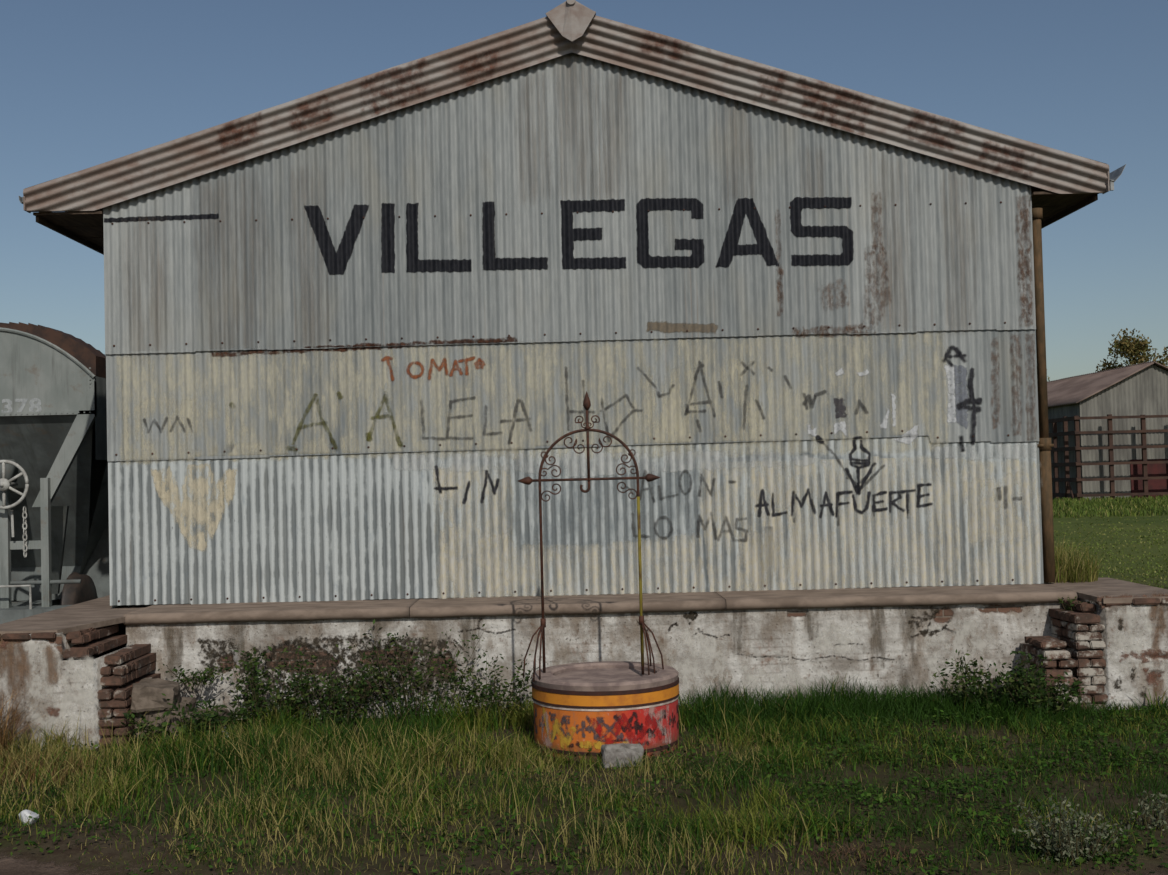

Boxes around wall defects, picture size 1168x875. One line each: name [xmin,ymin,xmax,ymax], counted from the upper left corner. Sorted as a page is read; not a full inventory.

corrosion [366,59,423,114]
corrosion [804,85,864,132]
corrosion [909,110,960,149]
corrosion [982,142,1031,179]
crack [637,621,730,638]
crack [753,616,955,661]
peeling [1097,593,1168,691]
peeling [7,635,97,751]